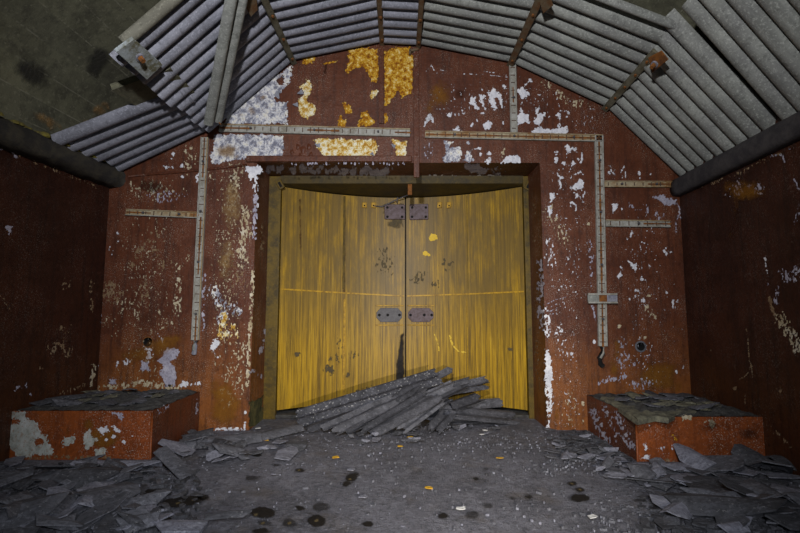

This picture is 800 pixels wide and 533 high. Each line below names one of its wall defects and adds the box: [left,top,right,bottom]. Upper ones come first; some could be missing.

peeling [440,78,593,133]
peeling [442,140,521,176]
peeling [202,46,413,405]
peeling [60,217,201,394]
spalling [536,144,697,478]
rust [214,387,237,421]
peeling [9,410,133,460]
rust [86,422,116,446]